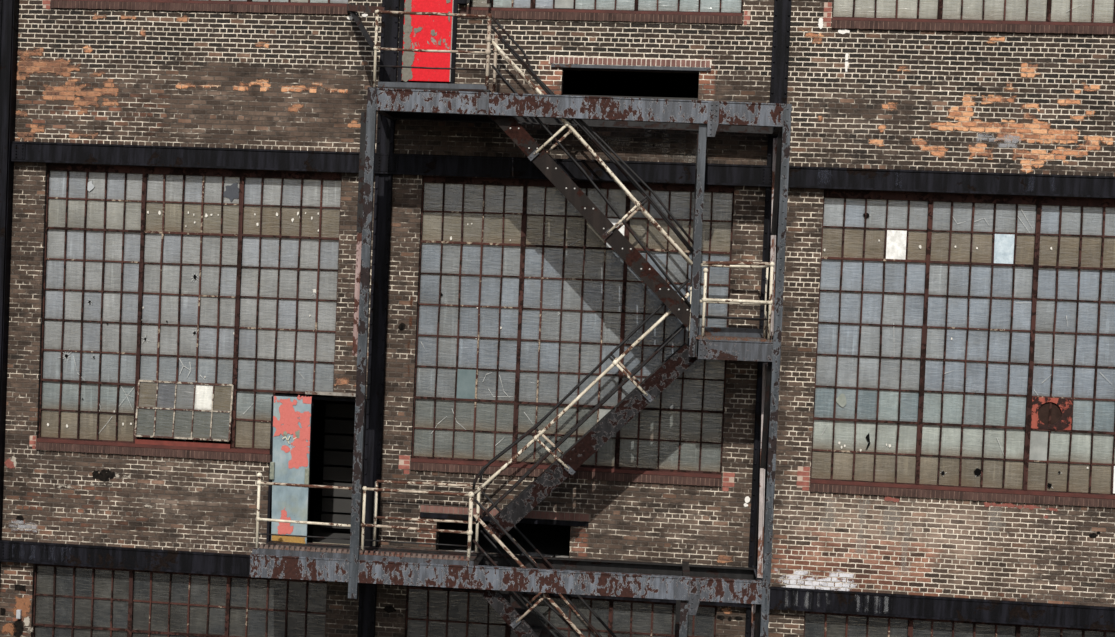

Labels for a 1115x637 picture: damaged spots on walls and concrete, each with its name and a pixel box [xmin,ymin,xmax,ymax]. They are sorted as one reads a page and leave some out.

peeling [401,0,441,82]
spalling [16,45,119,115]
spalling [176,79,348,112]
spalling [15,110,44,141]
spalling [869,125,886,146]
spalling [912,138,948,158]
spalling [930,63,1113,173]
peeling [273,395,312,469]
peeling [277,508,293,535]
leakage [782,571,888,611]